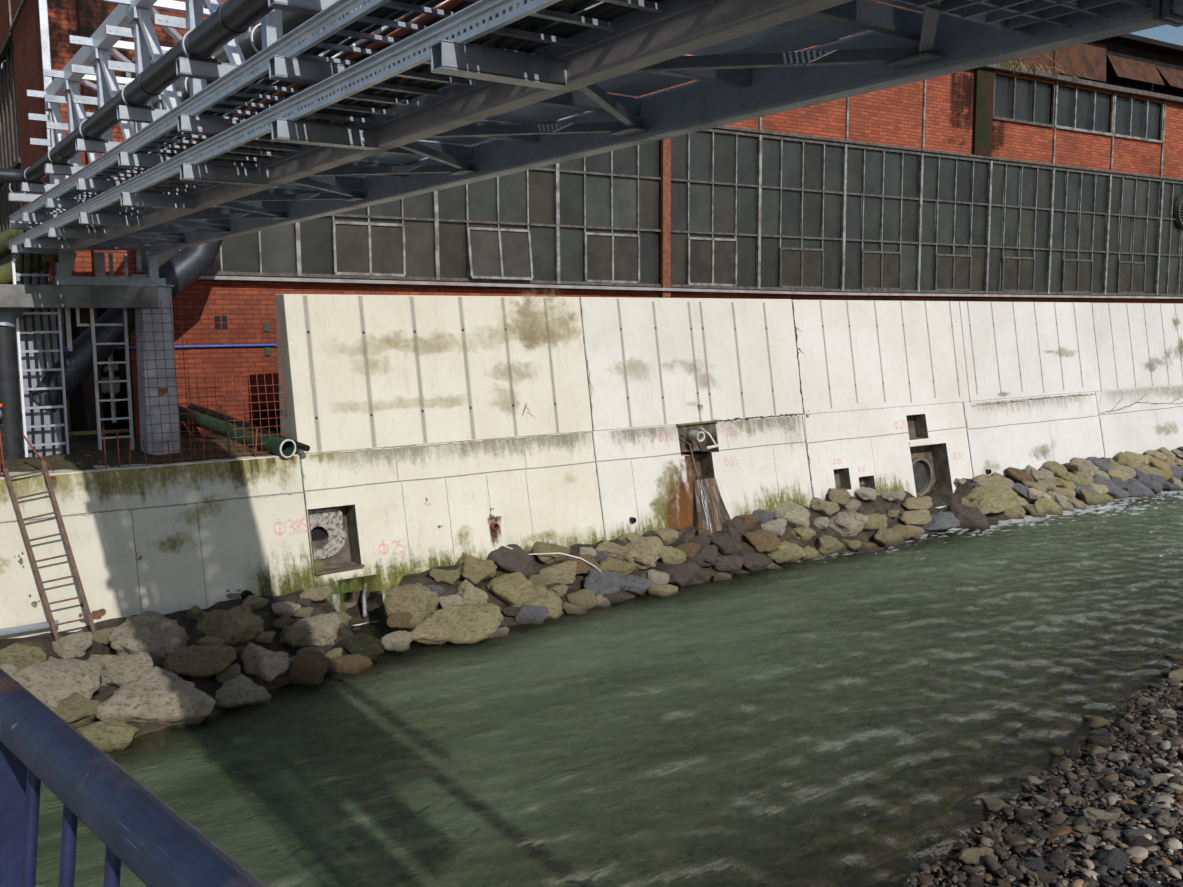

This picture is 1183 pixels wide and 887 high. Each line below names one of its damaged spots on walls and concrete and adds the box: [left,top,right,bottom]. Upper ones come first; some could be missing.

crack [964,305,1183,473]
leakage [93,456,296,495]
corrosion [667,455,699,529]
corrosion [488,516,501,542]
leakage [261,568,416,613]